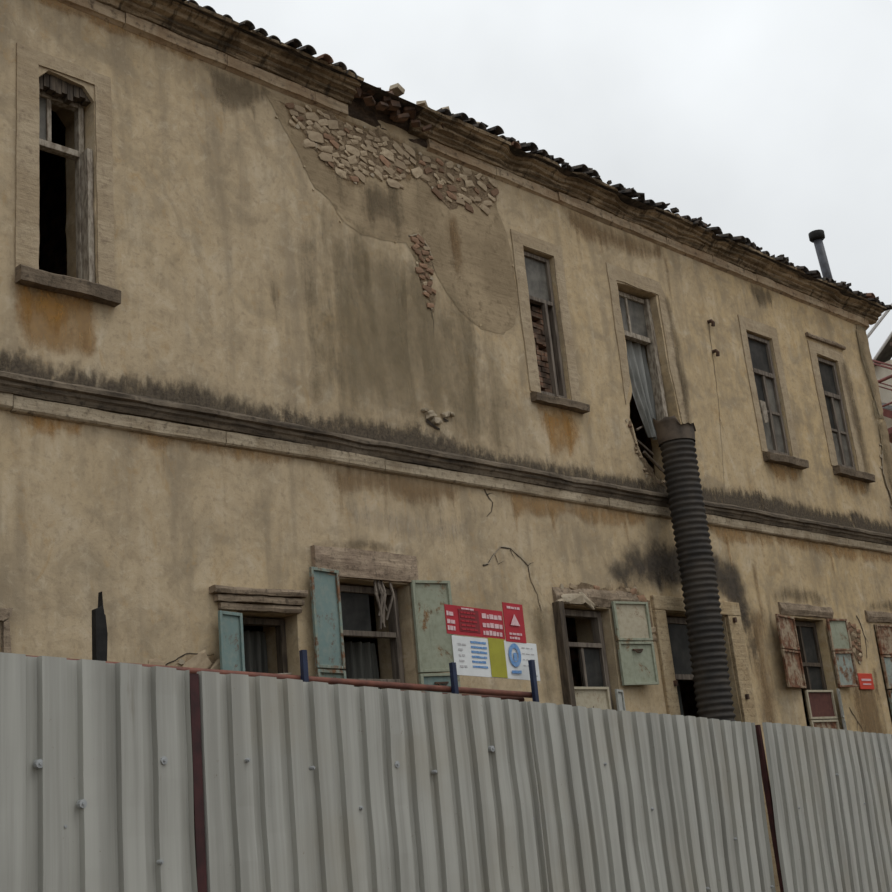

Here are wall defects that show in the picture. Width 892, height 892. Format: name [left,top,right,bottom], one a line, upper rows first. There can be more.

peeling [261,86,519,334]
leakage [338,263,454,404]
leakage [0,343,667,493]
crack [483,546,542,608]
leakage [702,488,892,535]
spalling [178,649,220,670]